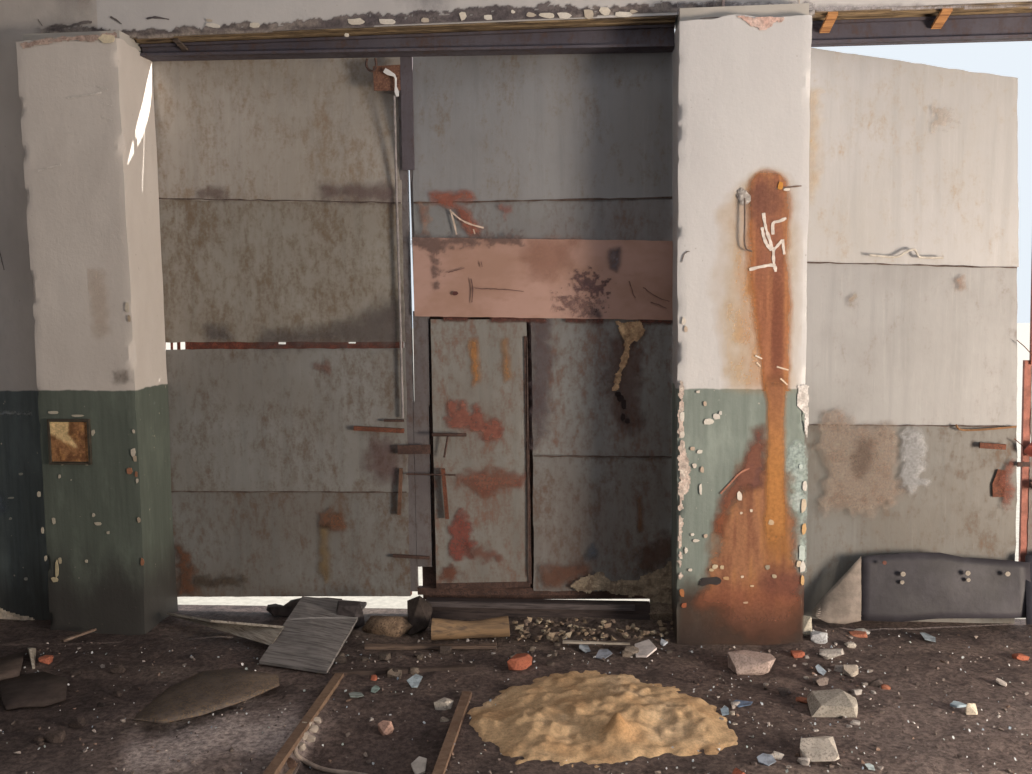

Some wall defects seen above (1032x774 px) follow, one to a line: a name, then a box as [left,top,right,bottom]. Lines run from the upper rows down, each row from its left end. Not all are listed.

peeling [20,1,720,49]
rust [430,191,484,235]
rust [444,400,505,441]
rust [681,172,804,645]
rust [459,471,526,496]
peeling [677,381,722,608]
rust [441,509,502,581]
peeling [699,564,754,587]
spalling [0,608,35,620]